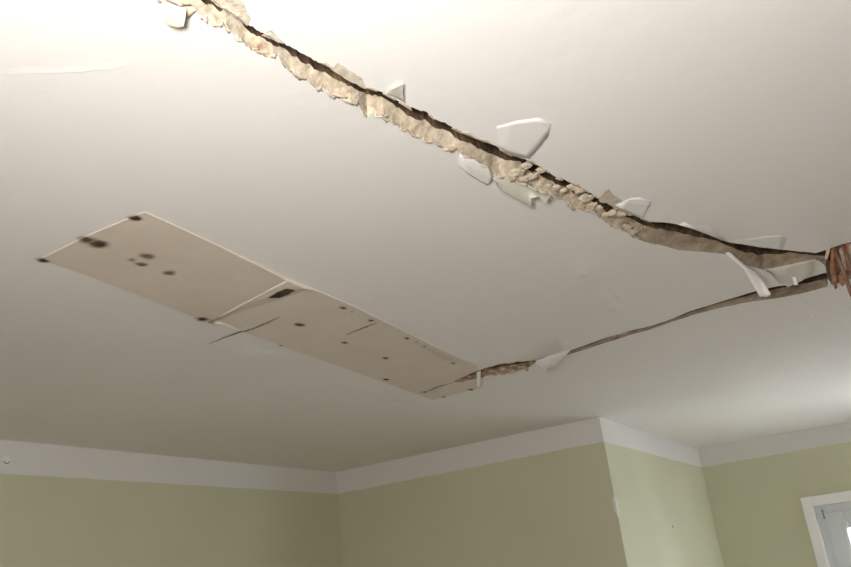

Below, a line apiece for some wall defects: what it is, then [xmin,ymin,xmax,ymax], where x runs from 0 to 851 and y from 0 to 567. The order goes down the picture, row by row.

peeling [164,4,187,28]
peeling [496,118,551,159]
crack [156,0,851,393]
peeling [458,155,551,208]
peeling [616,198,651,218]
peeling [678,222,787,250]
peeling [725,252,814,297]